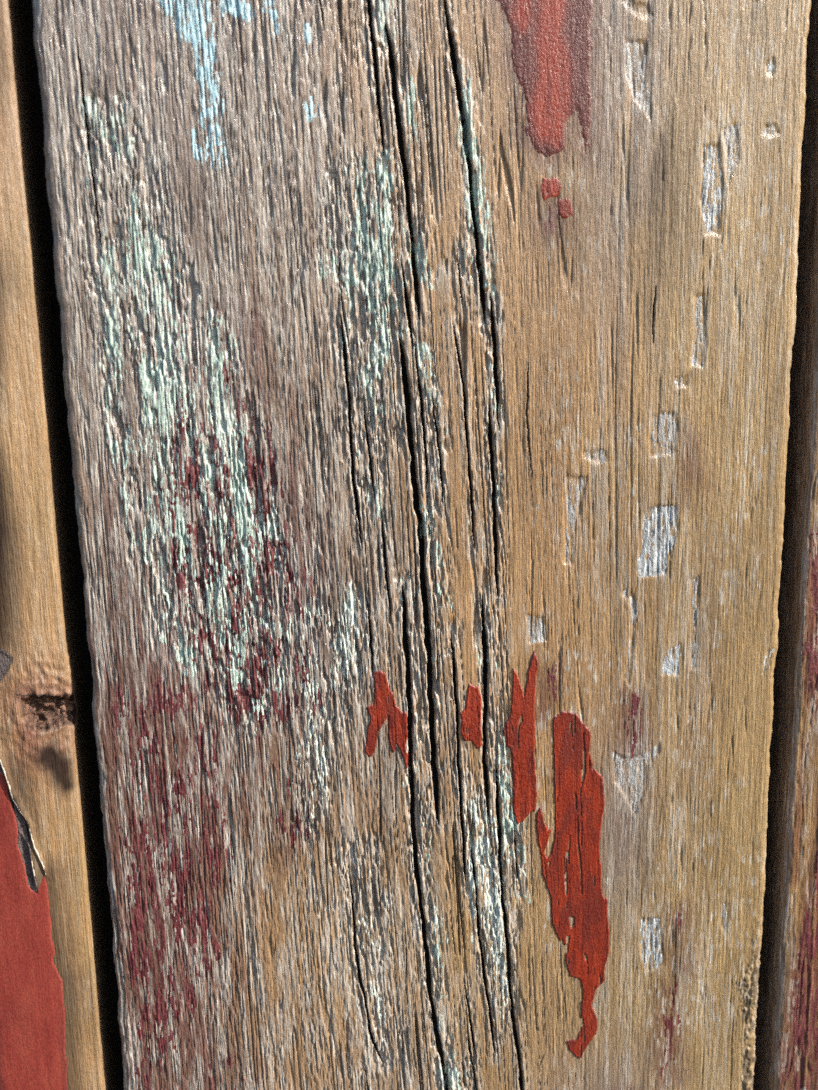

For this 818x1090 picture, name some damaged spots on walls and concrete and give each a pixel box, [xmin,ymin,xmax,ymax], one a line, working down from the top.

peeling [496,0,596,157]
peeling [541,177,573,219]
crack [341,0,544,1090]
peeling [0,649,12,681]
peeling [365,671,408,769]
peeling [460,683,483,749]
peeling [0,760,46,891]
peeling [502,616,662,1059]